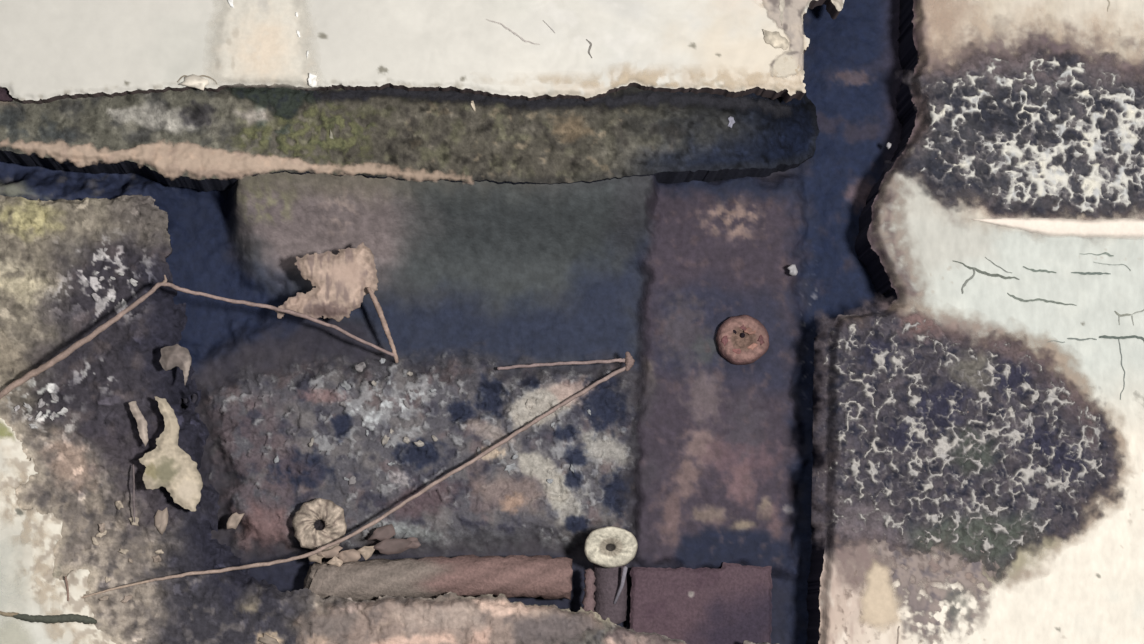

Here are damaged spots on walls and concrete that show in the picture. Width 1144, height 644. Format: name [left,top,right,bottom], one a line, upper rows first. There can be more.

peeling [180,74,209,91]
peeling [308,73,317,87]
peeling [0,140,473,184]
crack [954,252,1131,306]
leakage [811,19,1144,644]
crack [1049,310,1144,400]
spalling [0,195,686,644]